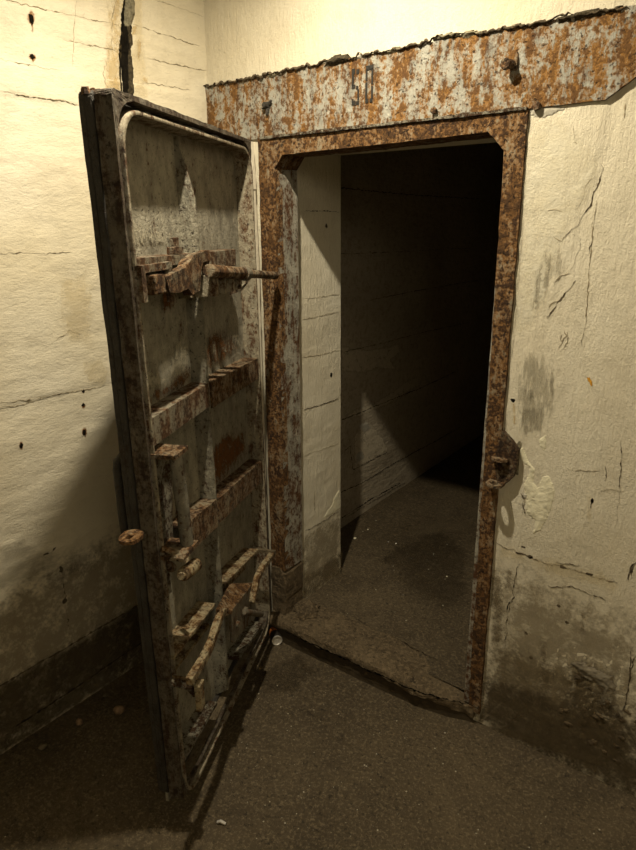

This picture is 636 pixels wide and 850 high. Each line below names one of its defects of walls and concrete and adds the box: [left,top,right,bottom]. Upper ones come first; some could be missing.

crack [7,0,196,95]
crack [547,176,601,350]
rust [213,433,247,484]
peeling [516,441,555,533]
crack [496,542,635,646]
crack [282,629,478,709]
water stain [480,579,636,795]
crack [622,649,634,711]